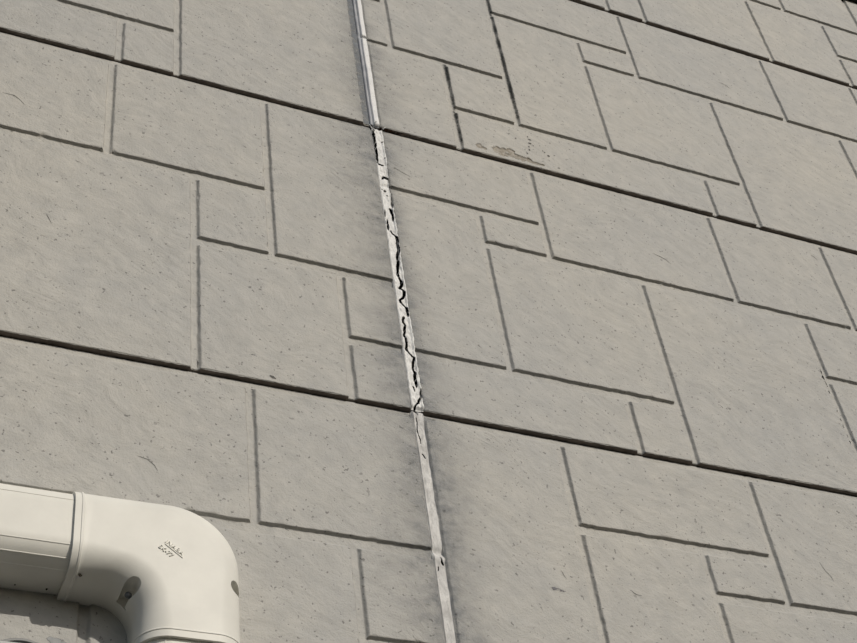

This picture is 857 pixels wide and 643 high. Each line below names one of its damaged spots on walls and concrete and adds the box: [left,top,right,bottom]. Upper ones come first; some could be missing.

crack [384,208,426,459]